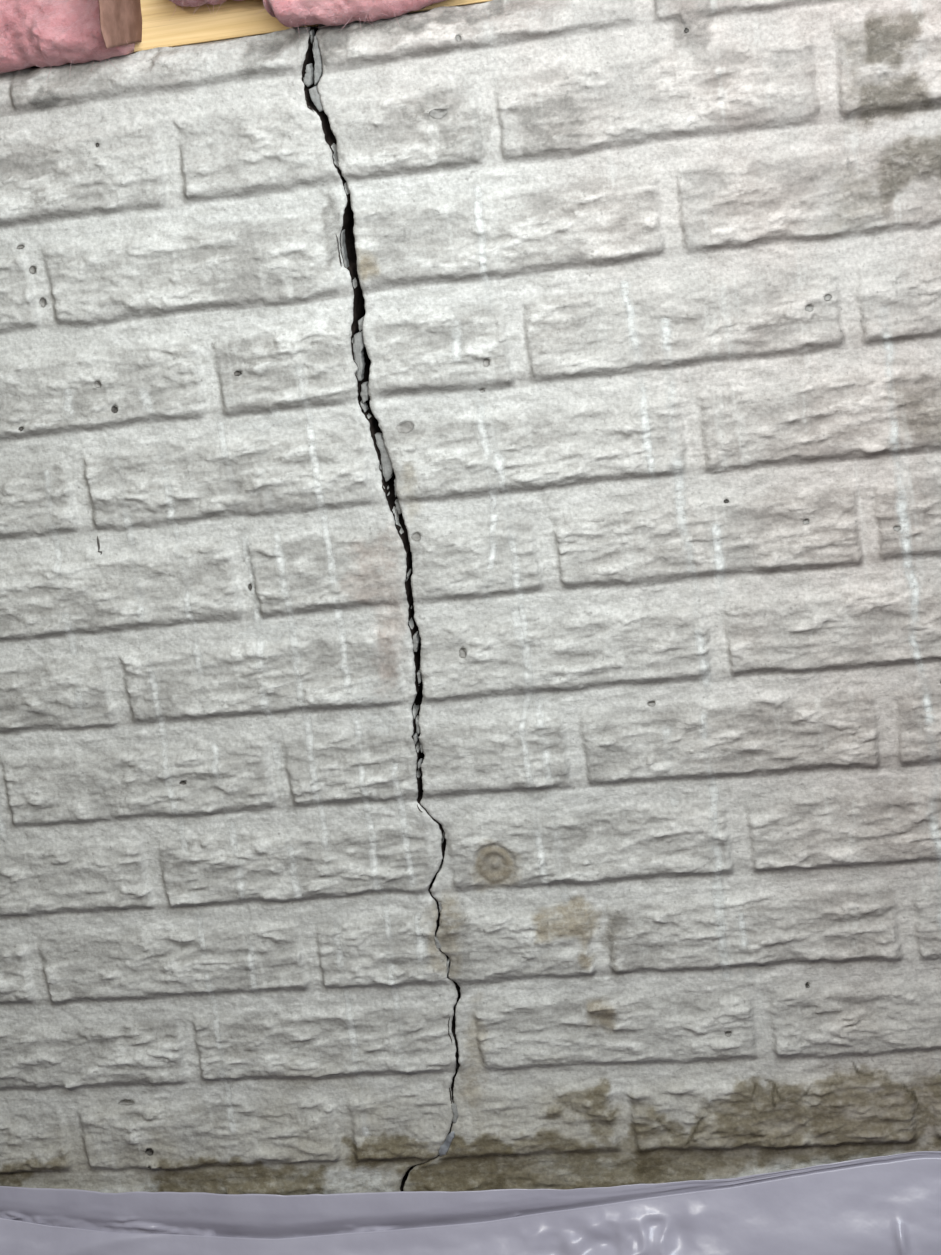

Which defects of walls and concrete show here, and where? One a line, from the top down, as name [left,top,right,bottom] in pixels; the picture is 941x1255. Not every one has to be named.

water stain [149,671,187,849]
water stain [240,531,328,847]
crack [302,26,461,1191]
water stain [287,846,302,899]
water stain [248,946,259,994]
water stain [278,1167,392,1195]